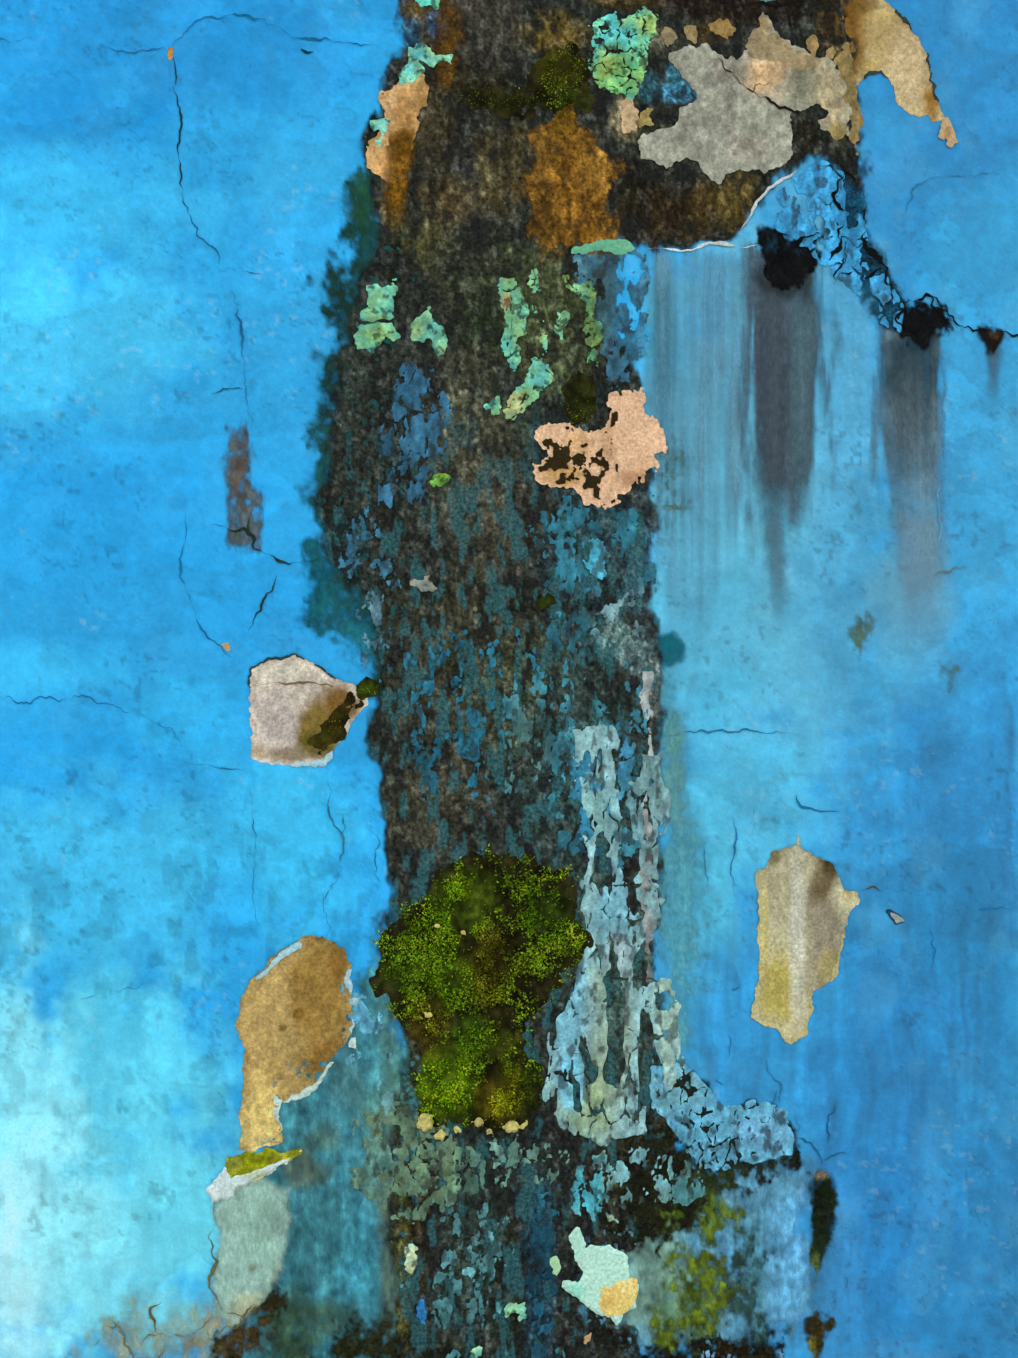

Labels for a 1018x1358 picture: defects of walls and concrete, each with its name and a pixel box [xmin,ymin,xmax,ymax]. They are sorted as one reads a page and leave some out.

rust [434,0,462,88]
crack [107,13,389,423]
rust [386,131,412,212]
rust [512,104,625,261]
crack [792,154,1018,575]
water stain [225,427,263,551]
crack [179,510,324,658]
peeling [248,653,368,768]
water stain [314,0,953,1358]
peeling [338,0,958,1358]
peeling [206,935,394,1203]
water stain [211,1177,313,1358]